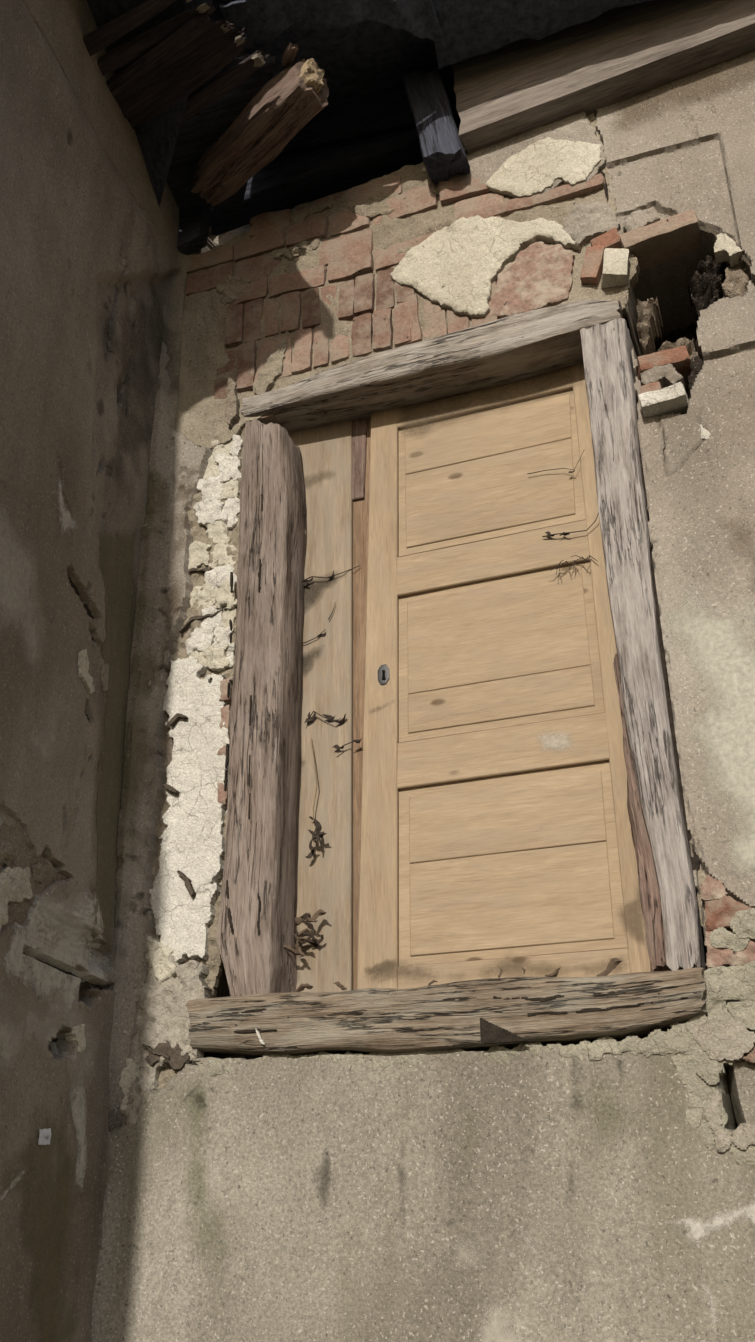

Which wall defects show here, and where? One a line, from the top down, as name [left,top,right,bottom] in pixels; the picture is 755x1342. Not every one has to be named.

peeling [0,815,115,1054]
damp [37,474,166,949]
flaking render [119,112,755,1165]